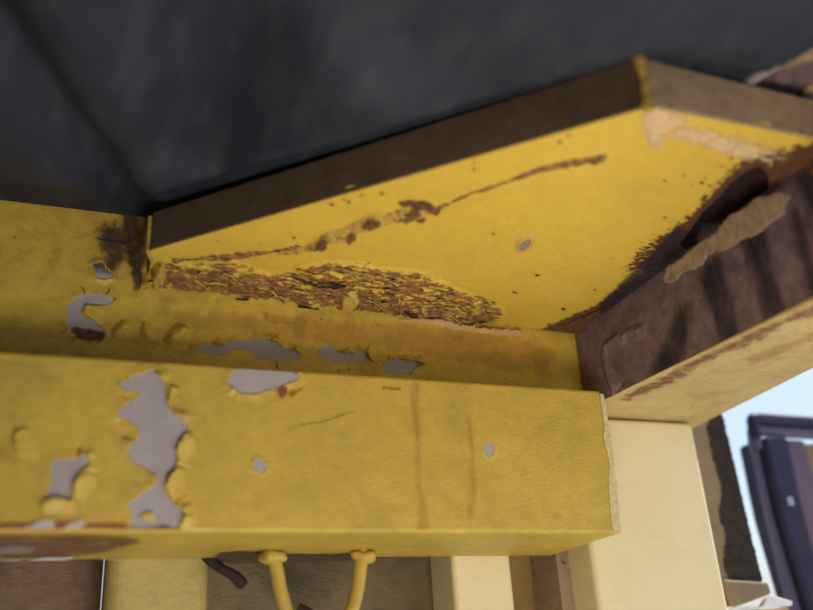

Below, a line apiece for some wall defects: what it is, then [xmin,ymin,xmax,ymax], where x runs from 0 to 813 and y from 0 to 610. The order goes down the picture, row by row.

peeling [632,56,789,244]
rust [398,200,441,223]
peeling [52,256,126,352]
rust [94,214,508,327]
rust [541,141,813,401]
peeling [188,331,429,404]
peeling [24,446,102,529]
peeling [105,363,200,529]
rust [0,521,137,558]